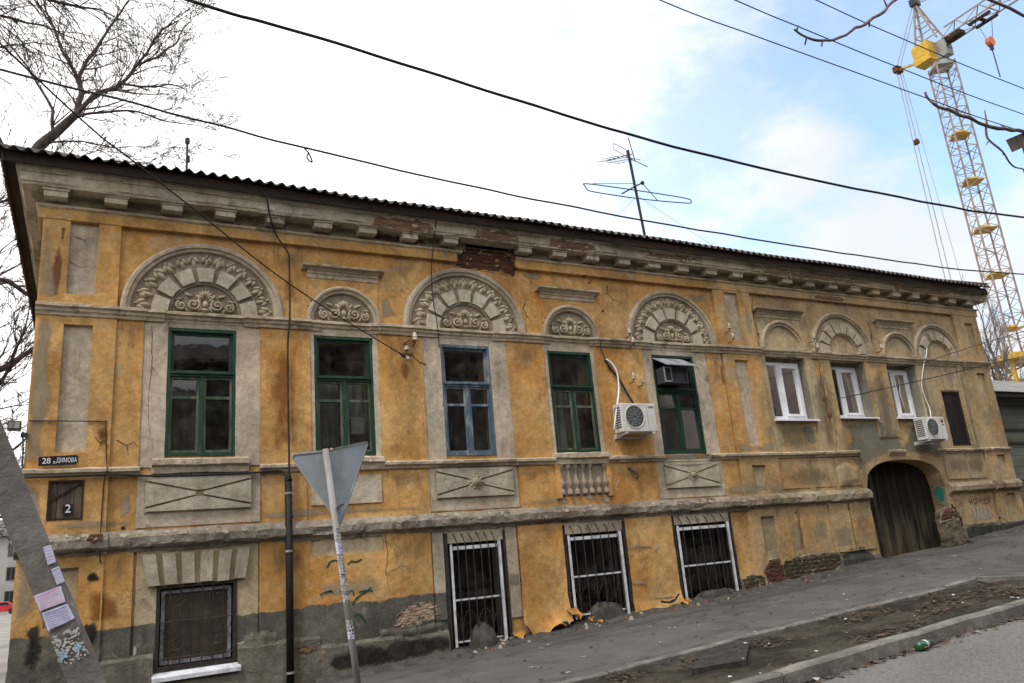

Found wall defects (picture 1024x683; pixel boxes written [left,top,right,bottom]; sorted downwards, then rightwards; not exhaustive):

spalling [371,215,433,246]
spalling [453,229,532,277]
crack [95,326,158,455]
spalling [940,503,964,528]
peeling [440,495,612,641]
spalling [743,551,842,589]
spalling [395,601,441,629]